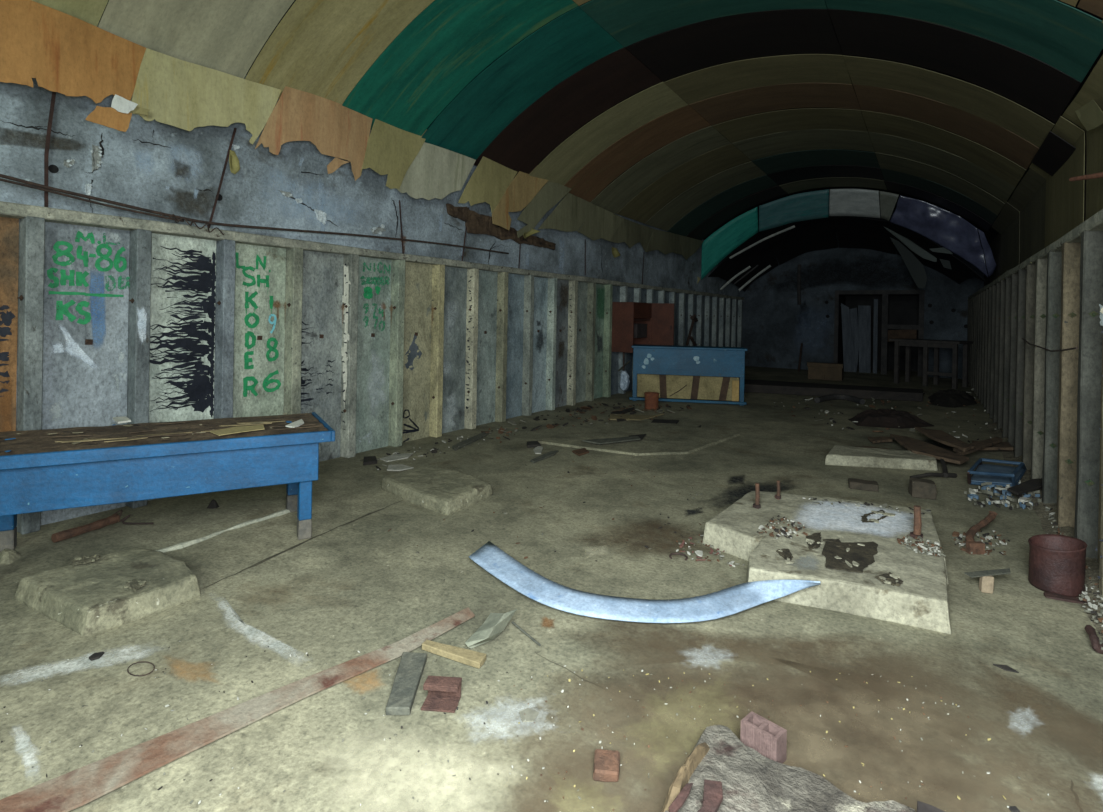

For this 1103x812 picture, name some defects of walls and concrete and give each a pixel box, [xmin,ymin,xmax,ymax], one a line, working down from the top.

rust [44,92,56,207]
spalling [85,144,102,195]
rust [208,128,237,228]